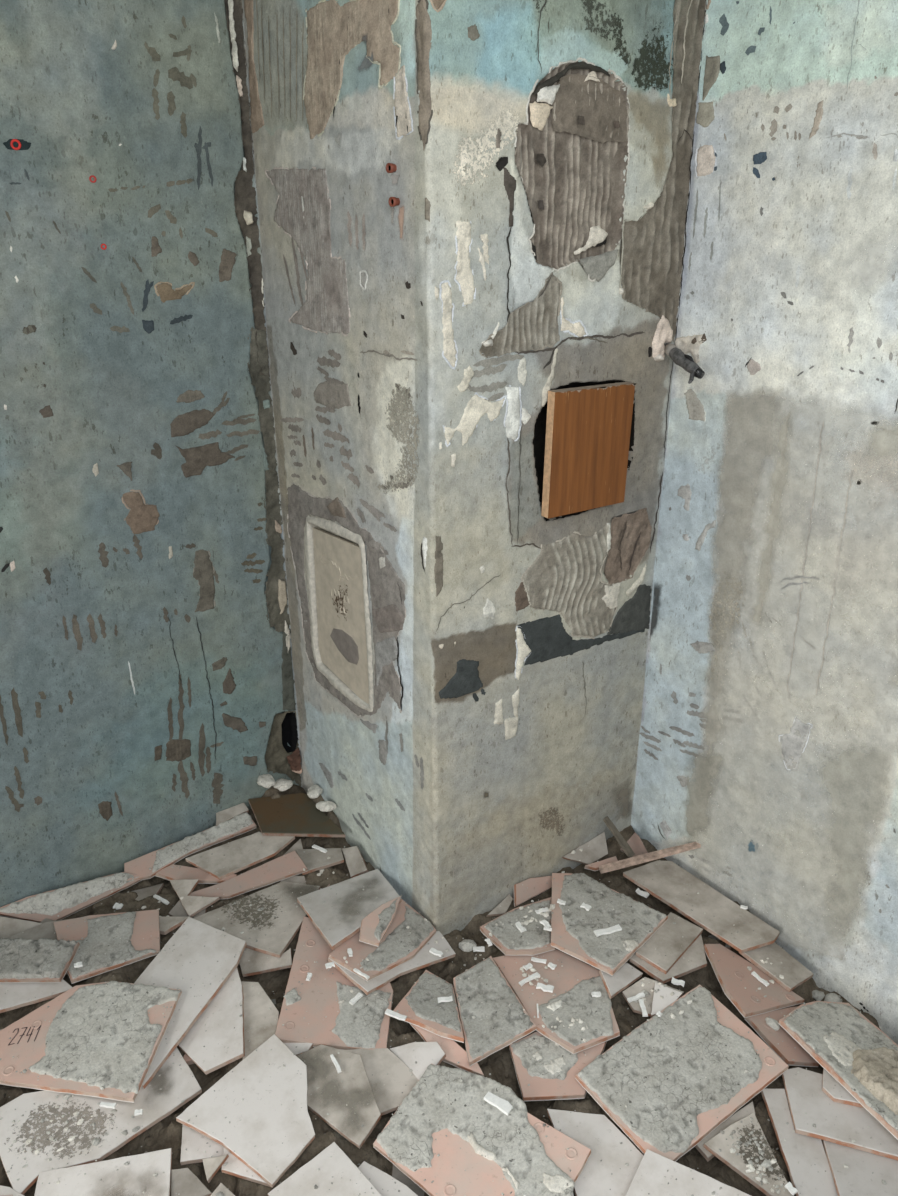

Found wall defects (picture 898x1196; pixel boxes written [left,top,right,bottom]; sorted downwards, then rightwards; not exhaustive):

peeling [303,0,447,150]
crack [537,0,550,73]
leakage [581,0,676,92]
peeling [745,6,772,55]
peeling [753,100,823,181]
leakage [640,395,788,836]
spalling [0,327,898,1196]